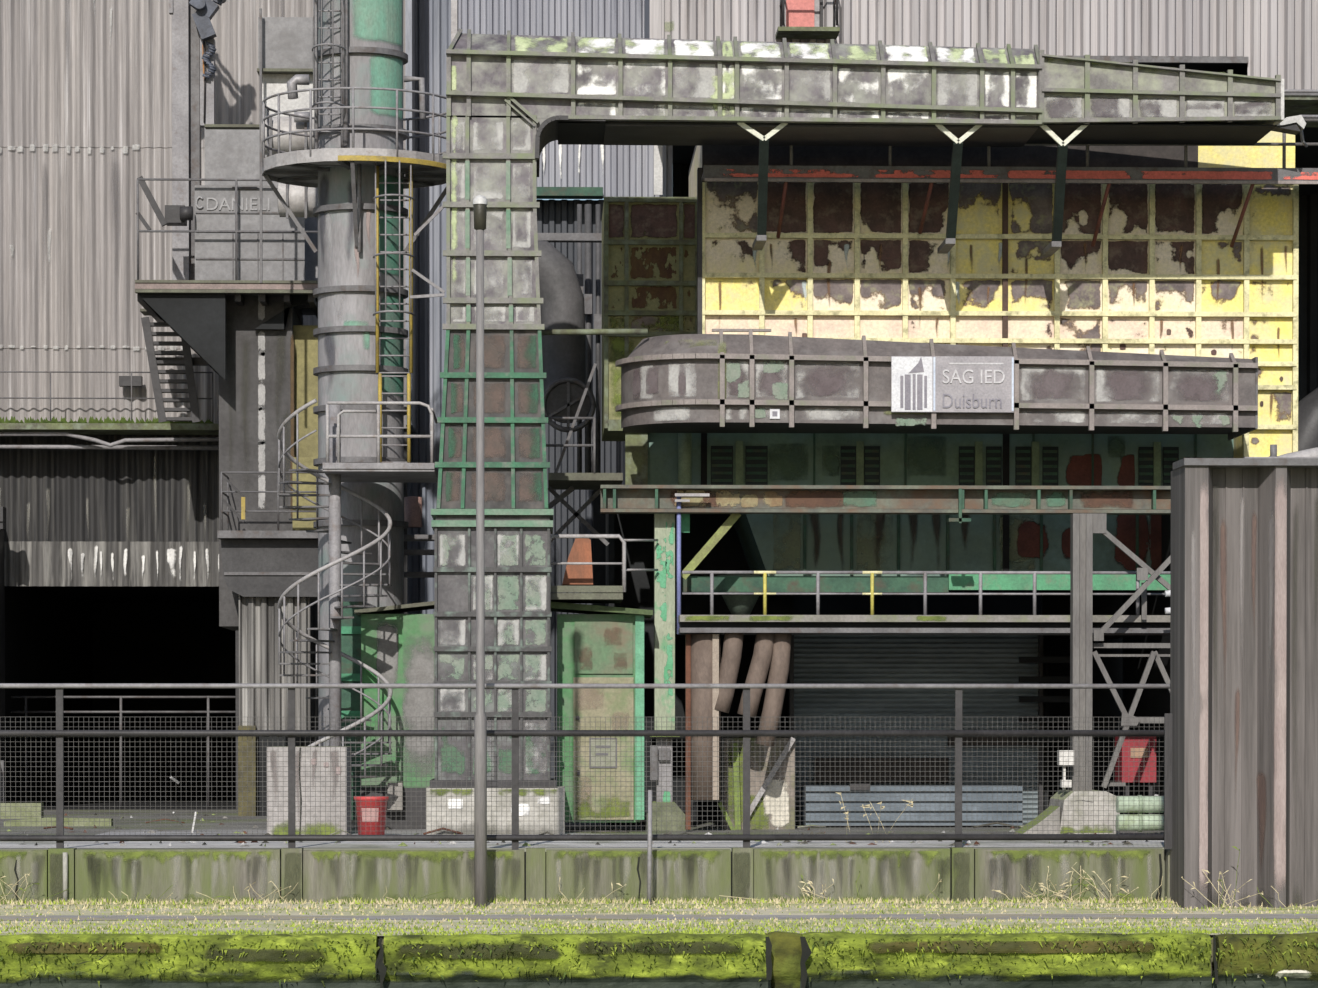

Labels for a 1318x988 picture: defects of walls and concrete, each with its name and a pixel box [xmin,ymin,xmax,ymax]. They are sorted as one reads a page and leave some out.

peeling [707,169,1318,352]
peeling [726,360,788,418]
peeling [1213,370,1227,392]
peeling [1172,415,1203,428]
rust [1081,491,1133,507]
rust [671,490,845,563]
water stain [50,854,63,901]
water stain [285,853,301,903]
water stain [578,941,742,954]